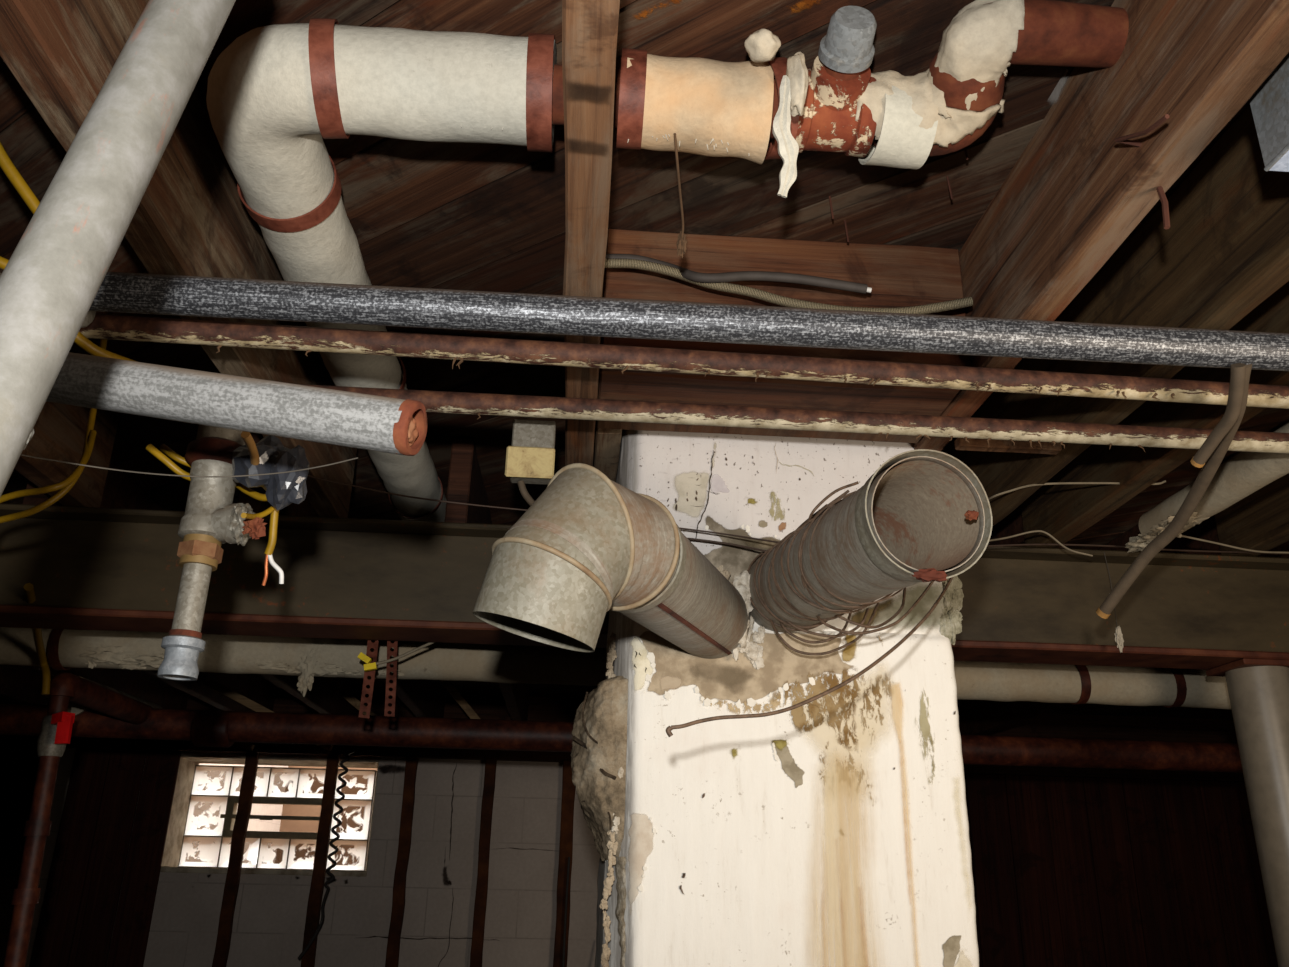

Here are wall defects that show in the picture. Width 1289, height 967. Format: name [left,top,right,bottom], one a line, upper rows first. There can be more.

peeling [667,451,782,583]
spalling [606,632,617,679]
peeling [640,631,853,708]
spalling [772,740,804,788]
water stain [773,670,886,791]
peeling [819,745,874,801]
peeling [861,677,893,736]
crack [363,763,499,967]
spalling [599,814,656,967]
spalling [943,936,972,967]